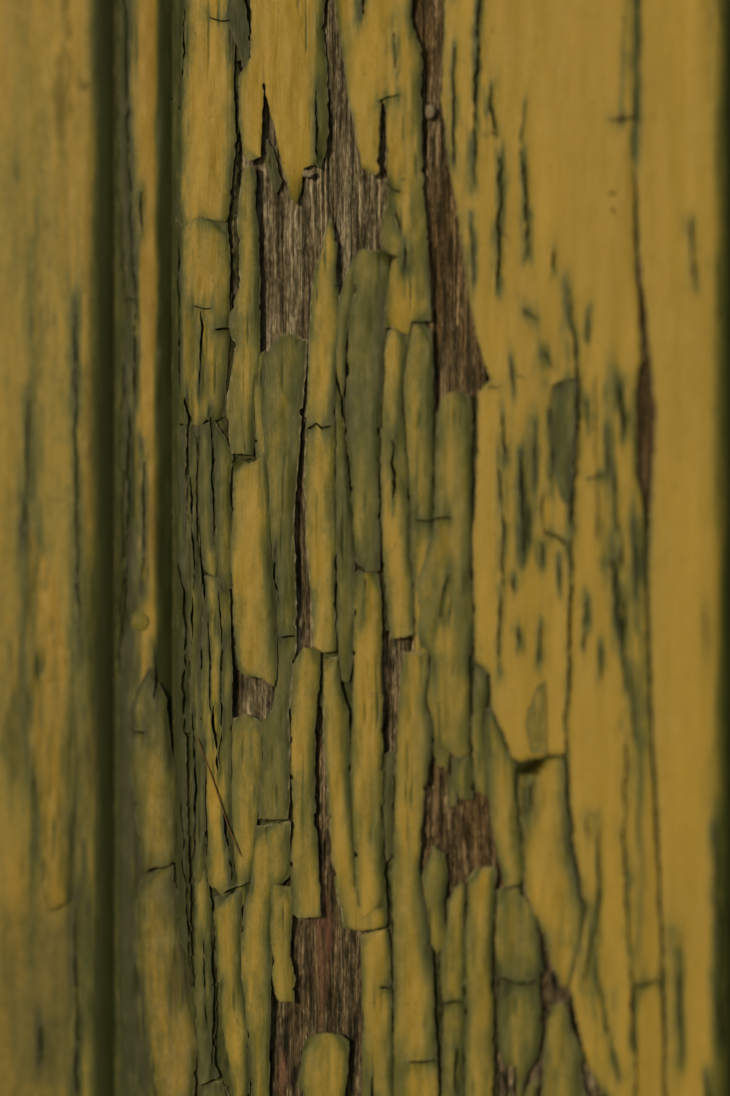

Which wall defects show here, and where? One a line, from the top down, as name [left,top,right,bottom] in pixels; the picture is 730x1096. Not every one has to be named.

crack [452,0,555,284]
crack [610,0,639,143]
peeling [117,0,606,1096]
crack [355,410,395,638]
peeling [23,527,76,911]
crack [416,292,682,1096]
crack [380,871,464,1096]
crack [714,839,722,1035]